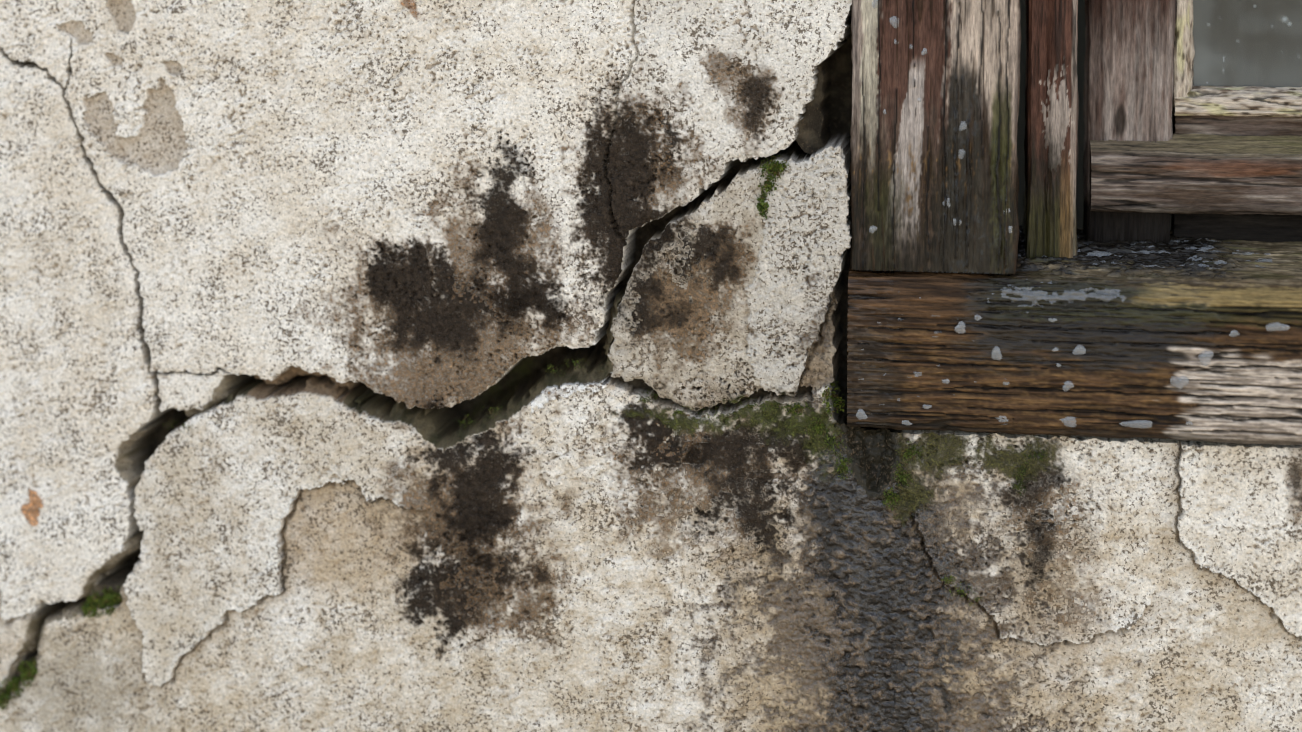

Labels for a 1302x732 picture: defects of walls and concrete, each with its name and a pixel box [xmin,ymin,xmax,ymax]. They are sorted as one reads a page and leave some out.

corrosion [21,490,43,526]
crack [0,38,815,704]
leakage [295,53,1112,732]